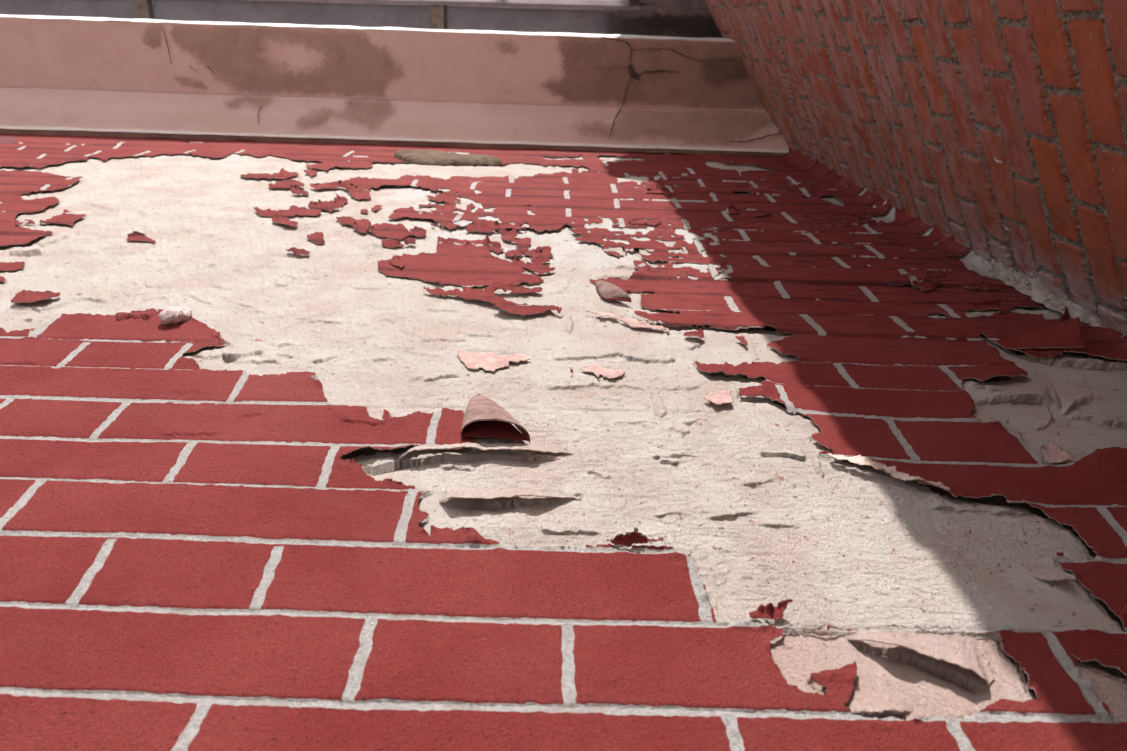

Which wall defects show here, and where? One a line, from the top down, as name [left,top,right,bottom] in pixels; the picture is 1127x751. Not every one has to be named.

damp [144,22,399,125]
crack [578,37,736,137]
damp [547,0,768,142]
peeling [0,149,1127,721]